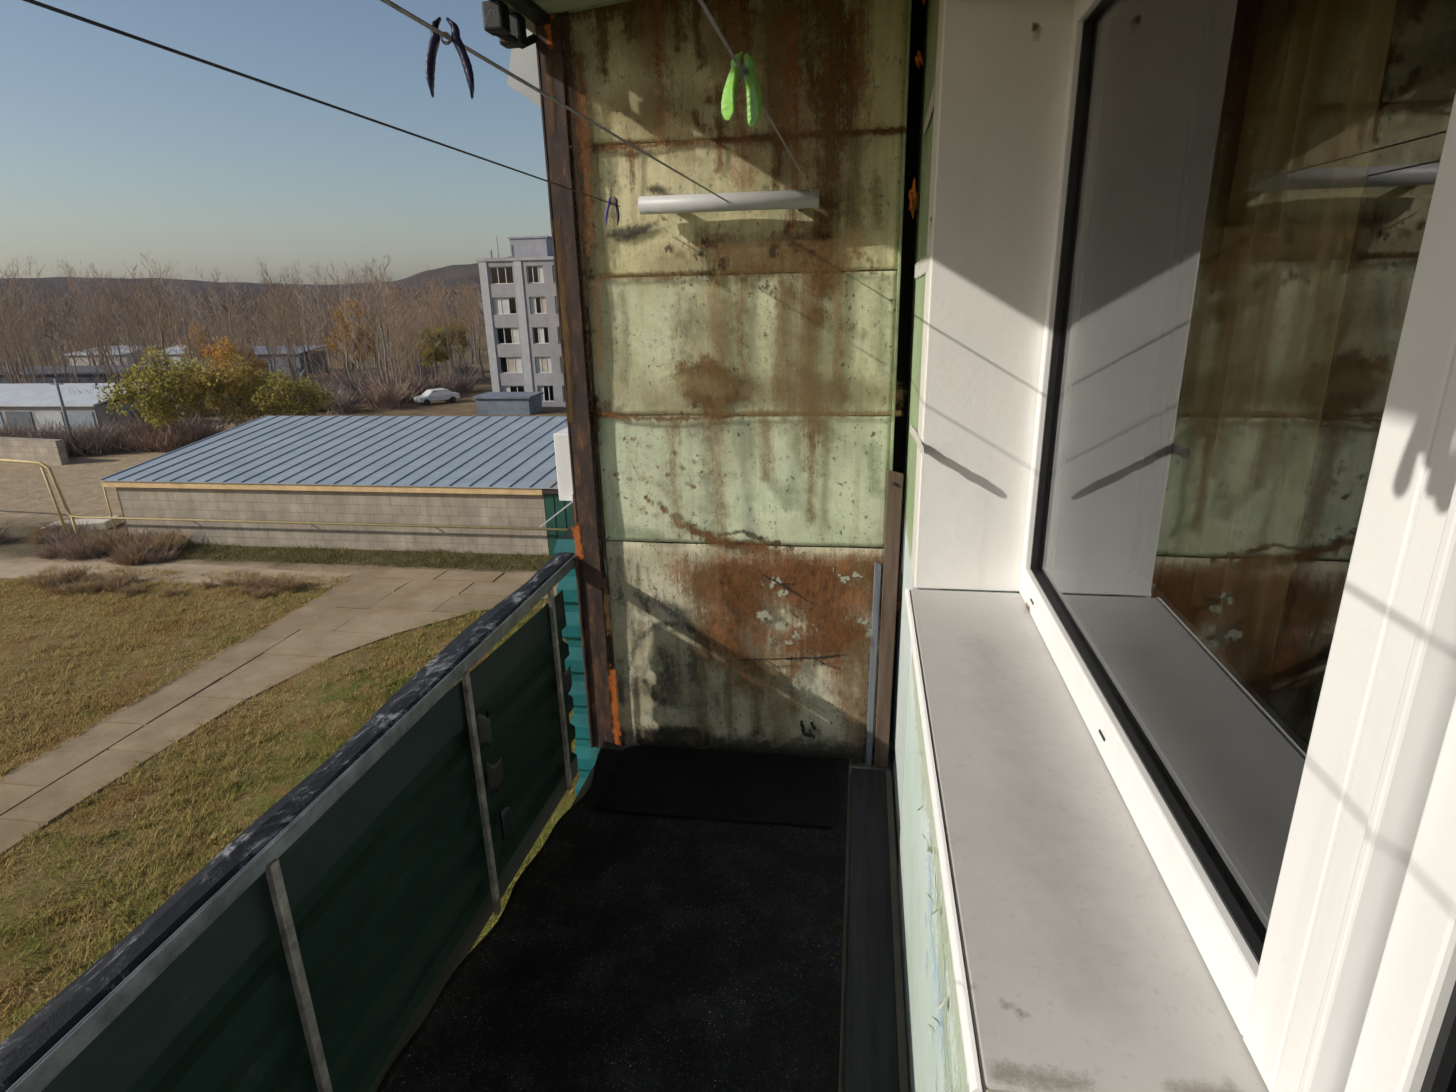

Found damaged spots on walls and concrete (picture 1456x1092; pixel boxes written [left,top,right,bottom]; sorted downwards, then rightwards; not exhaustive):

corrosion [543,0,907,746]
corrosion [908,177,918,218]
peeling [912,653,969,1092]